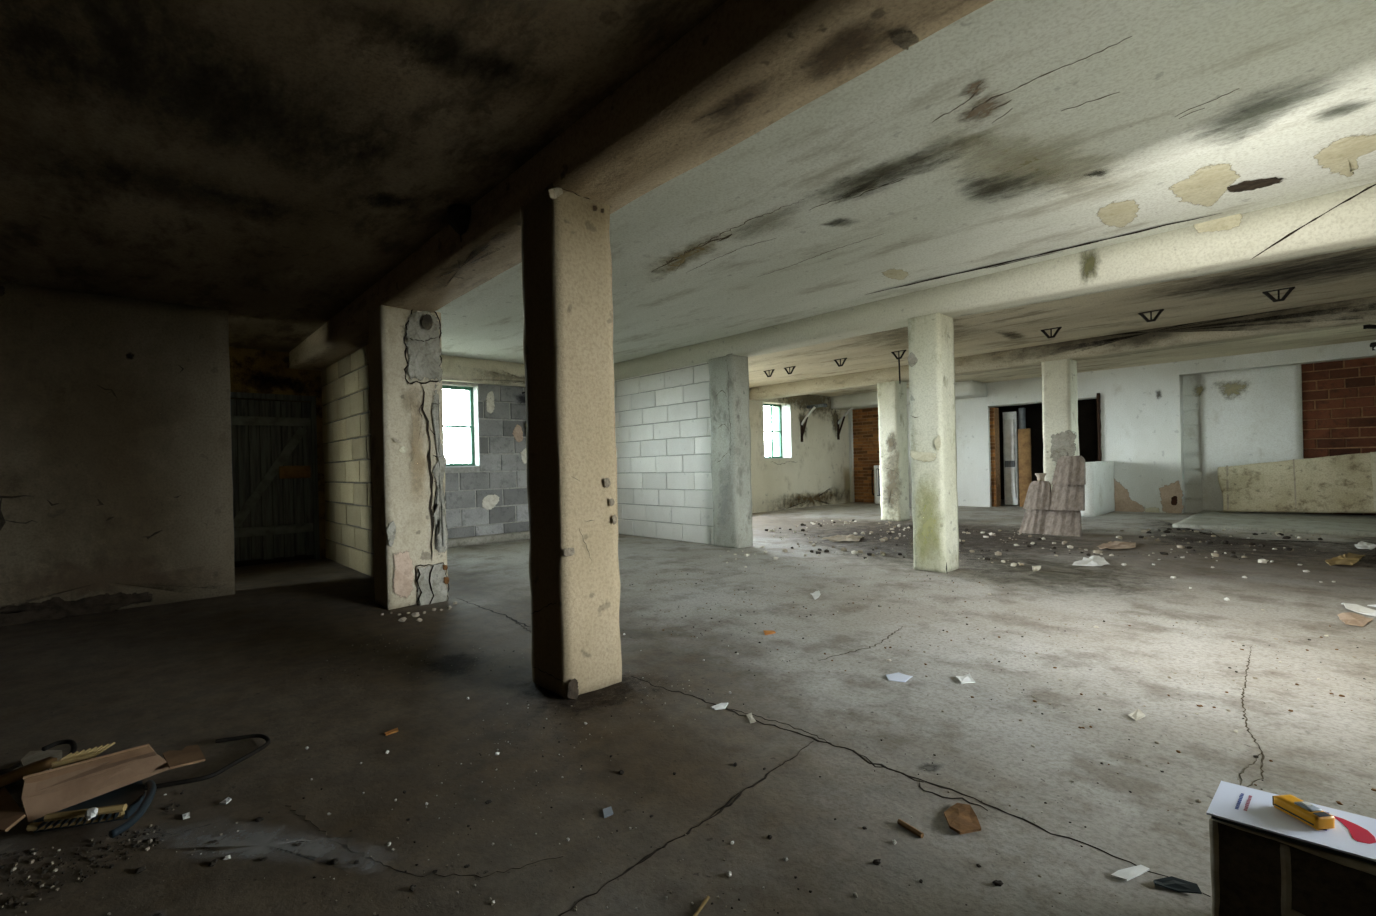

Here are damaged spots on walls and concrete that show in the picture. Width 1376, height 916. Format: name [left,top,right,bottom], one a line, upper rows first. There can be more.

damp [1213,92,1312,133]
damp [1324,104,1362,116]
damp [832,141,960,198]
damp [968,148,1063,198]
peeling [1097,200,1140,228]
peeling [1169,164,1243,233]
crack [1250,184,1376,260]
peeling [1313,134,1376,177]
spalling [387,309,449,606]
crack [416,384,556,632]
crack [1239,648,1265,787]
crack [558,676,1168,916]